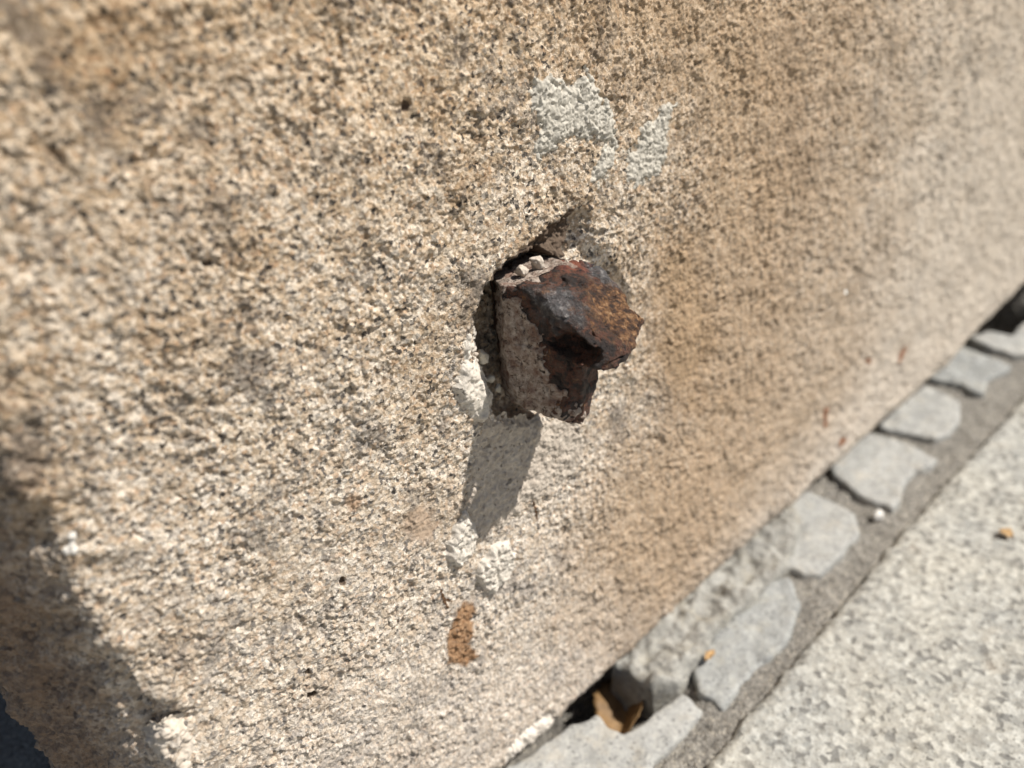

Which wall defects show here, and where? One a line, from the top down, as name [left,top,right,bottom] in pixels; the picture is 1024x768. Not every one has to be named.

spalling [483,209,575,290]
rust [447,601,478,666]